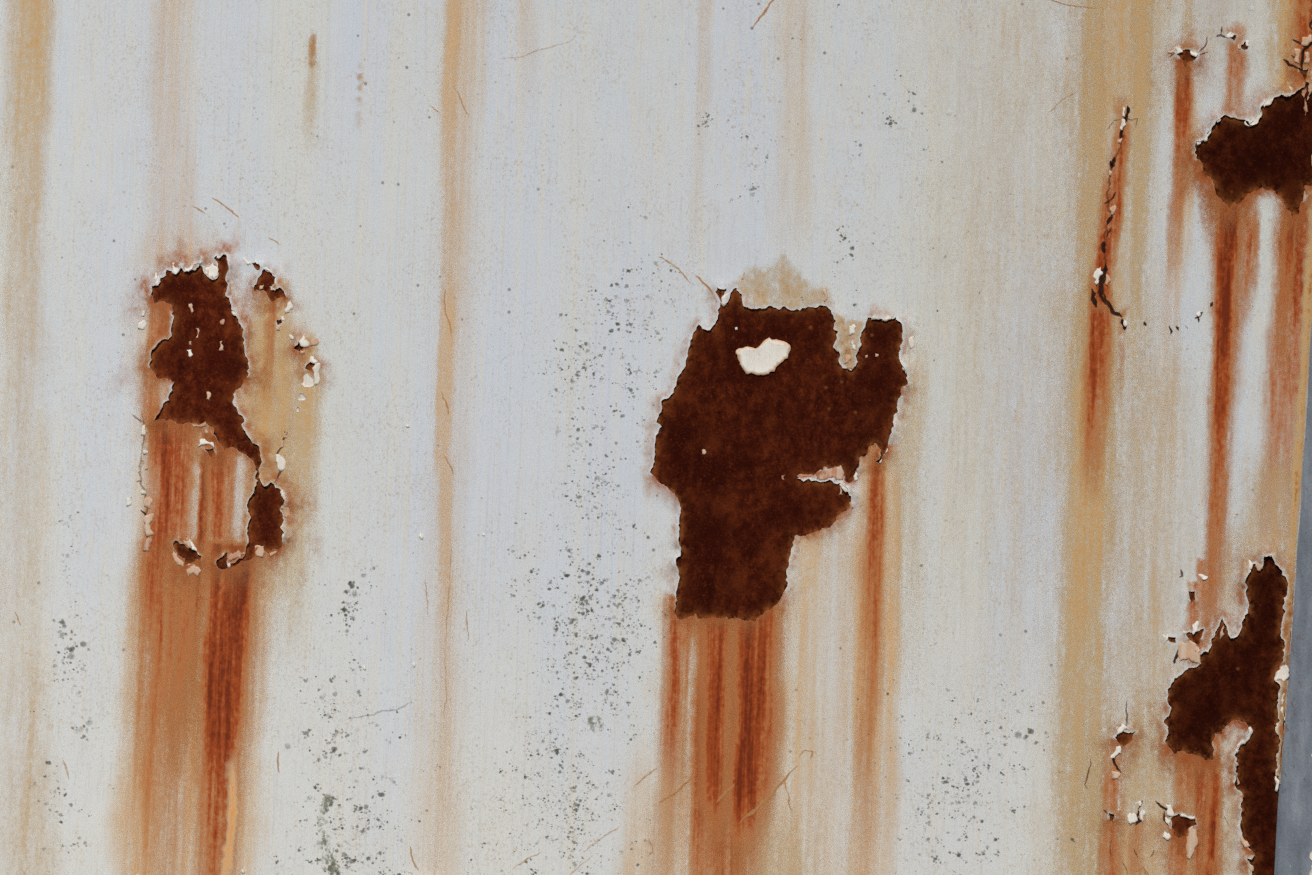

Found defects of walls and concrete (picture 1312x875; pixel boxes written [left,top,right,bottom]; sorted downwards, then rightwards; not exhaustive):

peeling [1167,27,1249,74]
peeling [1181,63,1312,224]
corrosion [116,279,320,875]
peeling [139,244,322,581]
corrosion [661,529,823,875]
peeling [650,257,915,625]
corrosion [844,446,900,875]
peeling [1110,703,1136,779]
corrosion [1060,0,1259,875]
peeling [1155,555,1294,875]
corrosion [1248,186,1312,774]